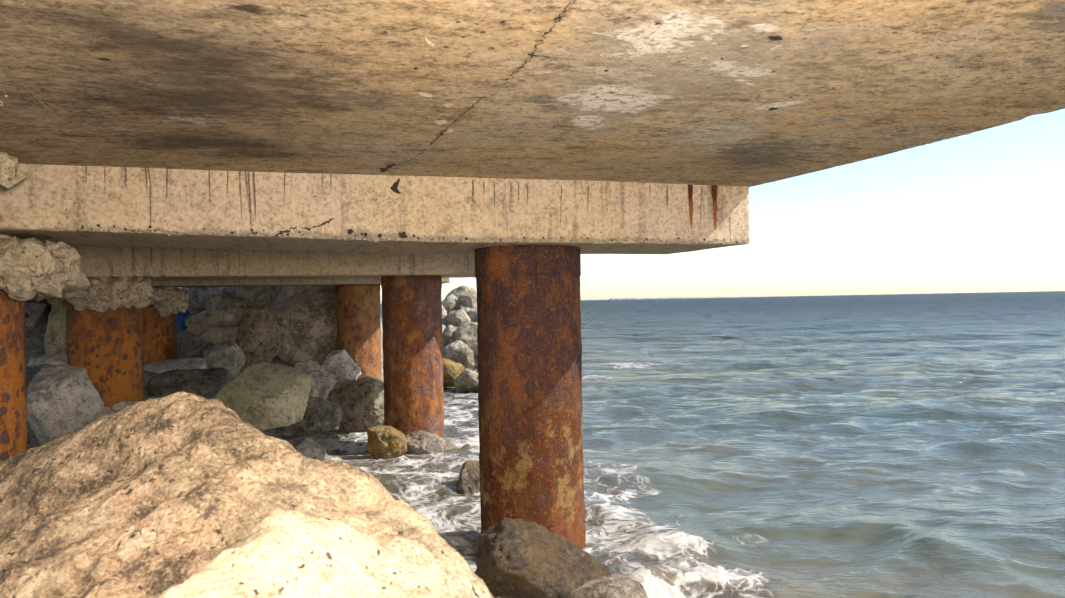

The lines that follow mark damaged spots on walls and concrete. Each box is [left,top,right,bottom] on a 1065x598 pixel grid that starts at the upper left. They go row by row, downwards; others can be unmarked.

leakage [74,20,290,156]
leakage [226,4,270,15]
crack [403,0,611,163]
leakage [531,6,784,131]